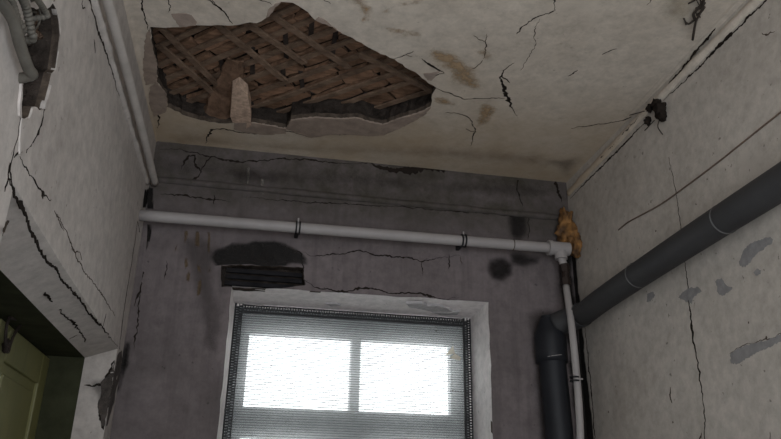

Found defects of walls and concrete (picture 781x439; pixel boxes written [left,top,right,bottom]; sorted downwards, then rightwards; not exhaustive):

spalling [17,8,61,154]
spalling [143,2,440,138]
crack [394,0,556,145]
crack [663,0,767,101]
crack [160,128,445,204]
crack [554,117,644,202]
crack [2,109,144,349]
crack [305,250,462,300]
peeling [739,237,773,276]
spalling [86,351,122,430]
crack [685,263,706,439]
peeling [730,333,781,364]